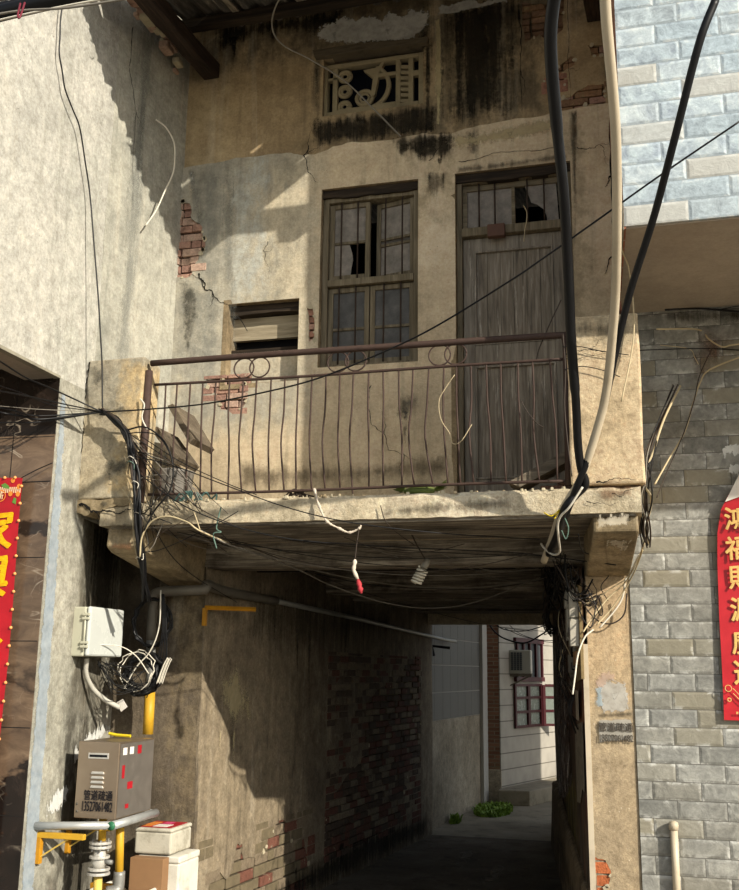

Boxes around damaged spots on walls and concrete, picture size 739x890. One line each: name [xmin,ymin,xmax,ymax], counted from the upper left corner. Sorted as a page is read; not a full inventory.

spalling [127,0,183,75]
leakage [216,9,342,57]
peeling [317,0,507,44]
leakage [313,2,532,164]
spalling [558,57,607,111]
spalling [177,199,207,279]
crack [192,273,226,306]
spalling [203,373,252,414]
crack [78,503,131,522]
peeling [596,679,629,713]
spalling [595,857,612,890]